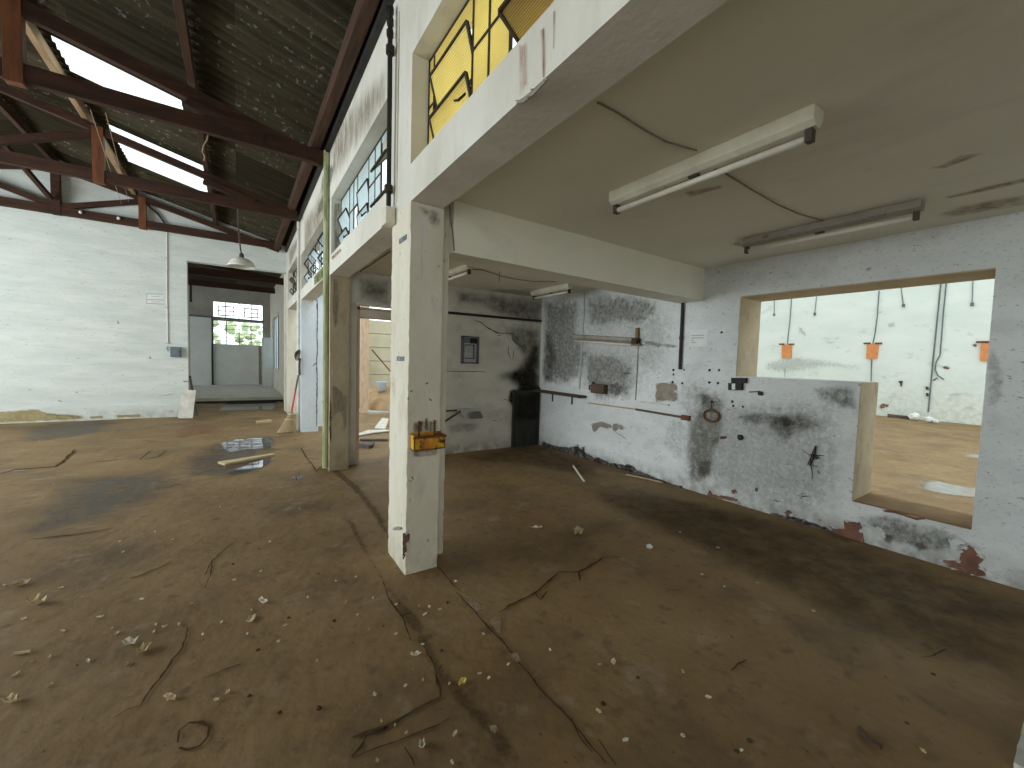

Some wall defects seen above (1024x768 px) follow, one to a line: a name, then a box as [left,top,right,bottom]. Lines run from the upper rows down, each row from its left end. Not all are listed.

leakage [690,396,718,479]
crack [0,450,167,474]
crack [205,541,239,587]
spalling [392,526,411,559]
spalling [828,520,886,543]
spalling [934,538,986,576]
crack [112,627,188,719]
crack [352,582,450,766]
crack [437,557,617,765]